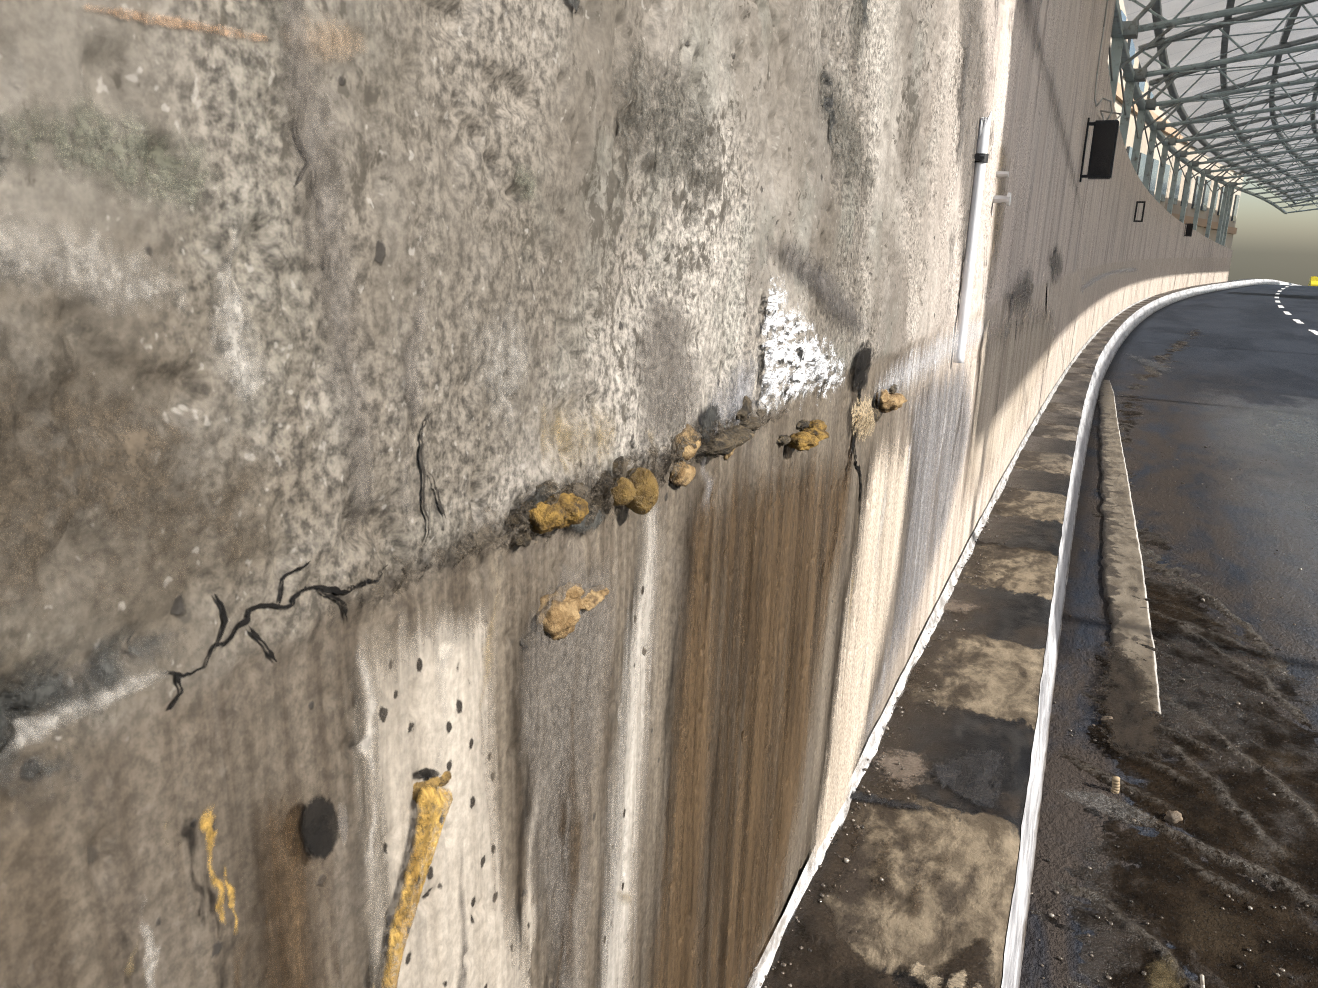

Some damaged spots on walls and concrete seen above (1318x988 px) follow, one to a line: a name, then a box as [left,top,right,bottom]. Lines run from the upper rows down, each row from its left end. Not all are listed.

rust [109,10,262,41]
water stain [729,277,845,421]
water stain [785,245,864,327]
crack [151,404,446,710]
crack [821,387,862,585]
water stain [816,273,1055,854]
spalling [0,628,166,774]
water stain [607,532,652,988]
water stain [656,464,850,988]
rust [200,810,237,930]
rust [384,768,453,988]